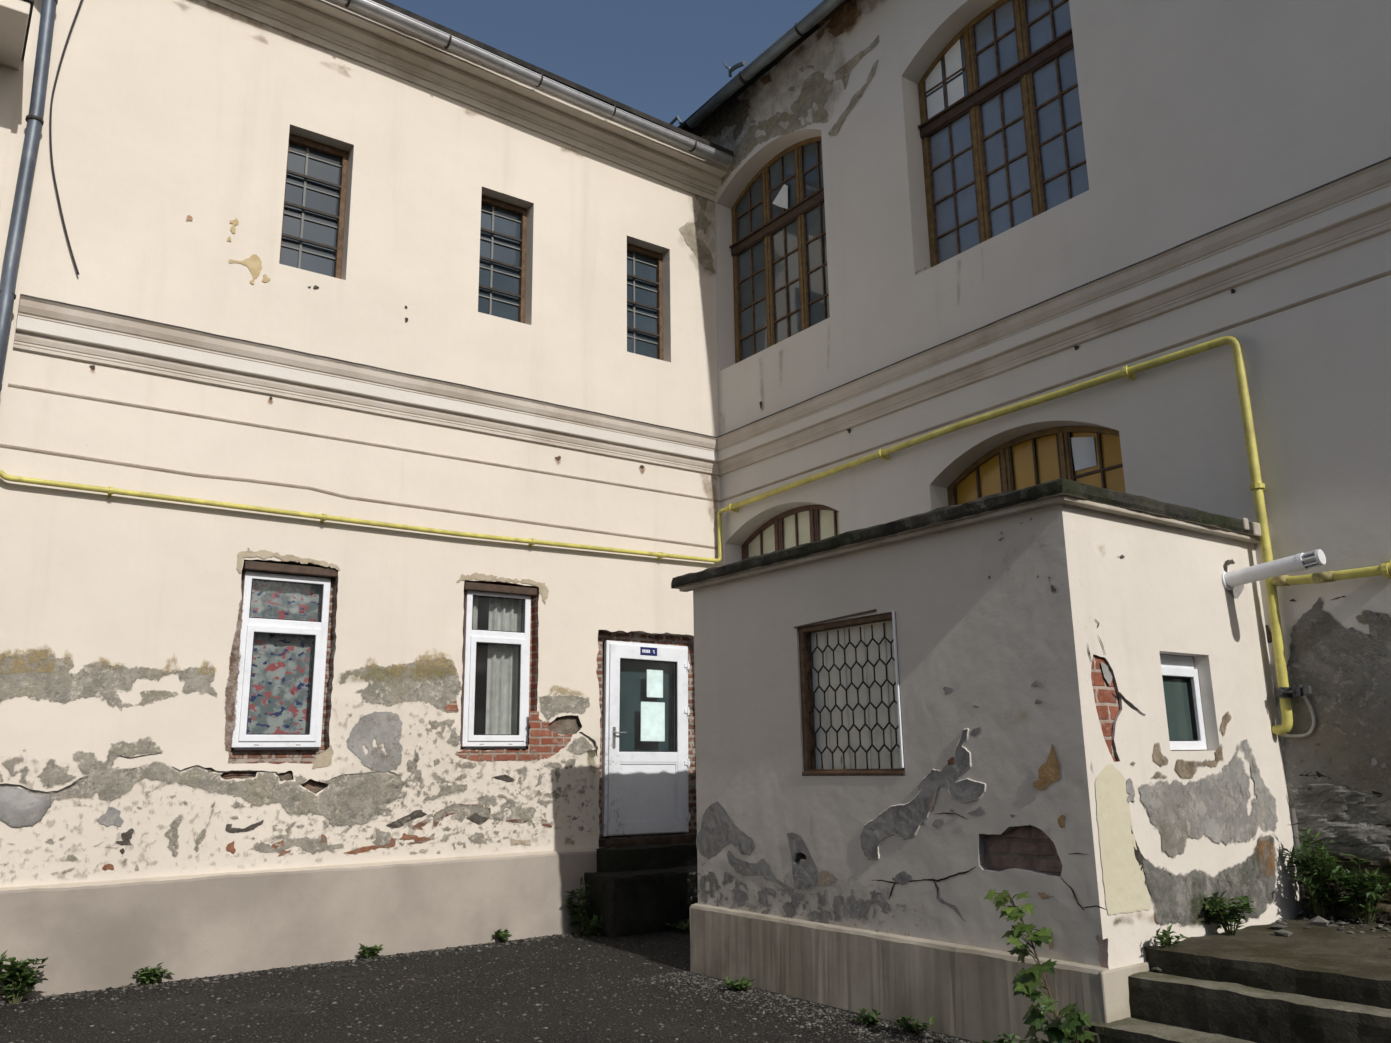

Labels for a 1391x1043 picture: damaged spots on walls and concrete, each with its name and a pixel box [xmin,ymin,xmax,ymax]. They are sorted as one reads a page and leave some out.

peeling [690,36,879,186]
peeling [229,254,270,284]
peeling [679,195,715,273]
peeling [237,548,340,573]
peeling [0,599,243,751]
peeling [0,653,590,870]
peeling [689,802,921,936]
peeling [860,727,987,860]
crack [872,867,975,921]
flaking render [978,814,1065,877]
peeling [1033,744,1060,790]
peeling [1088,596,1391,925]